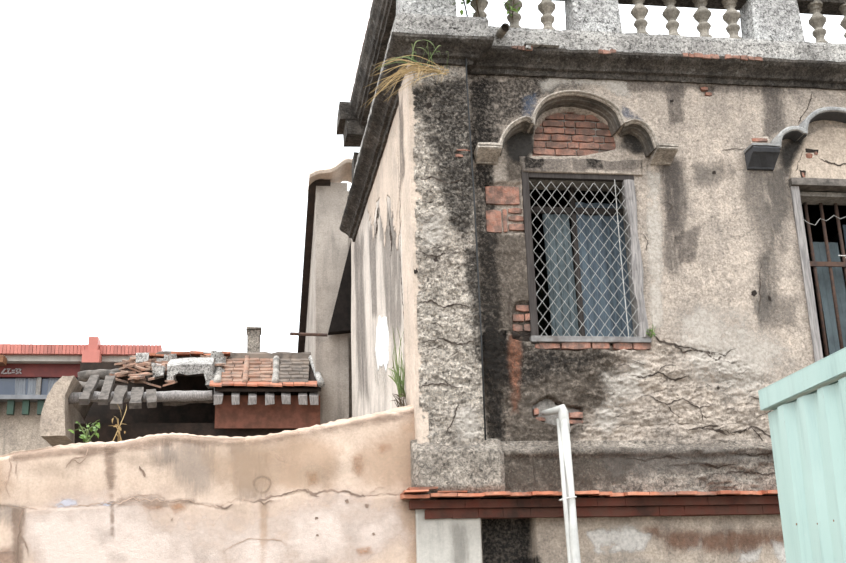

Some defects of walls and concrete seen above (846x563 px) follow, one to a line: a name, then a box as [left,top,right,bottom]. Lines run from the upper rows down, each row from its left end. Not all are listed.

flaking render [532,112,616,156]
flaking render [485,186,524,233]
crack [375,176,477,355]
leakage [413,75,698,441]
peeling [375,315,389,372]
leakage [682,310,781,393]
crack [419,378,462,433]
spalling [569,412,583,424]
crack [612,334,775,476]
leakage [504,453,561,492]
leakage [572,448,636,492]
crack [0,458,399,563]